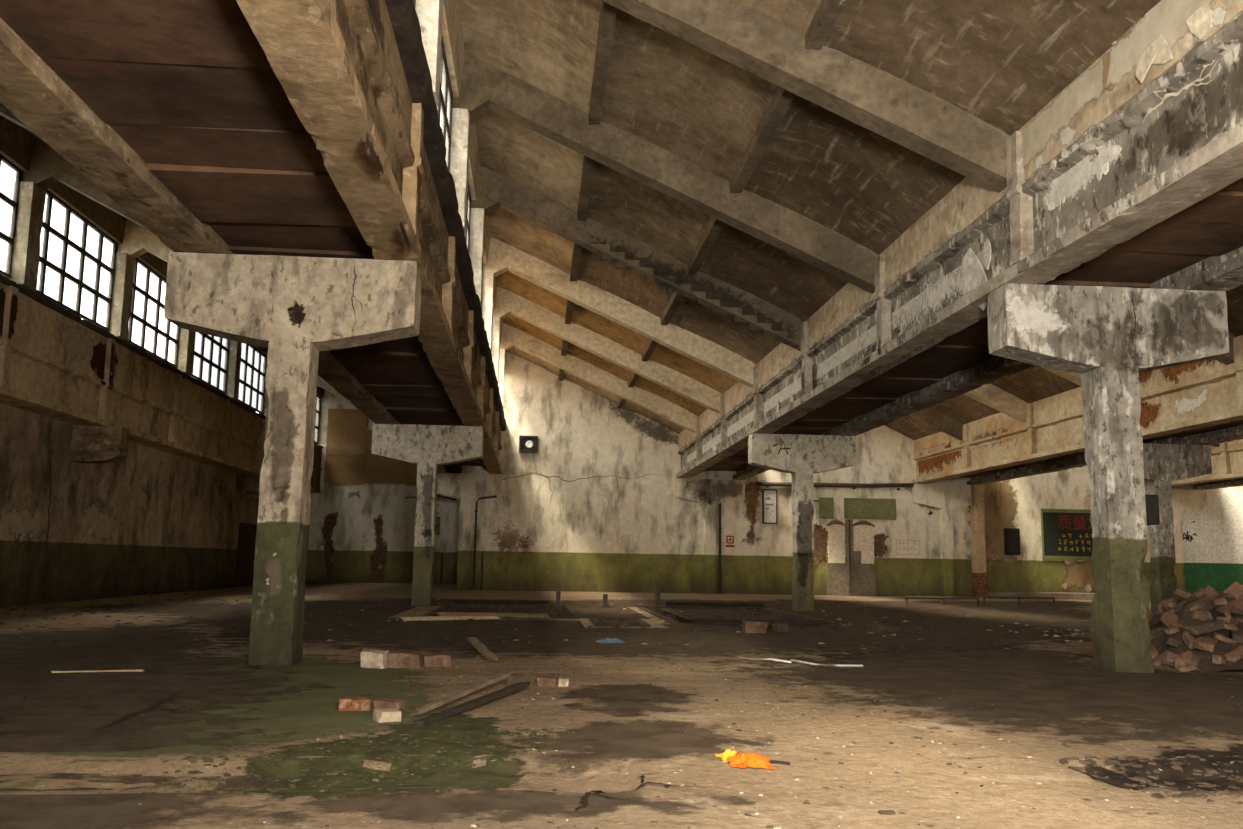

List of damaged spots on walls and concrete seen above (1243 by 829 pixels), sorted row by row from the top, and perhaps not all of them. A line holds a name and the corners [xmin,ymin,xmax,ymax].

peeling [1175,389,1208,414]
spalling [813,524,828,565]